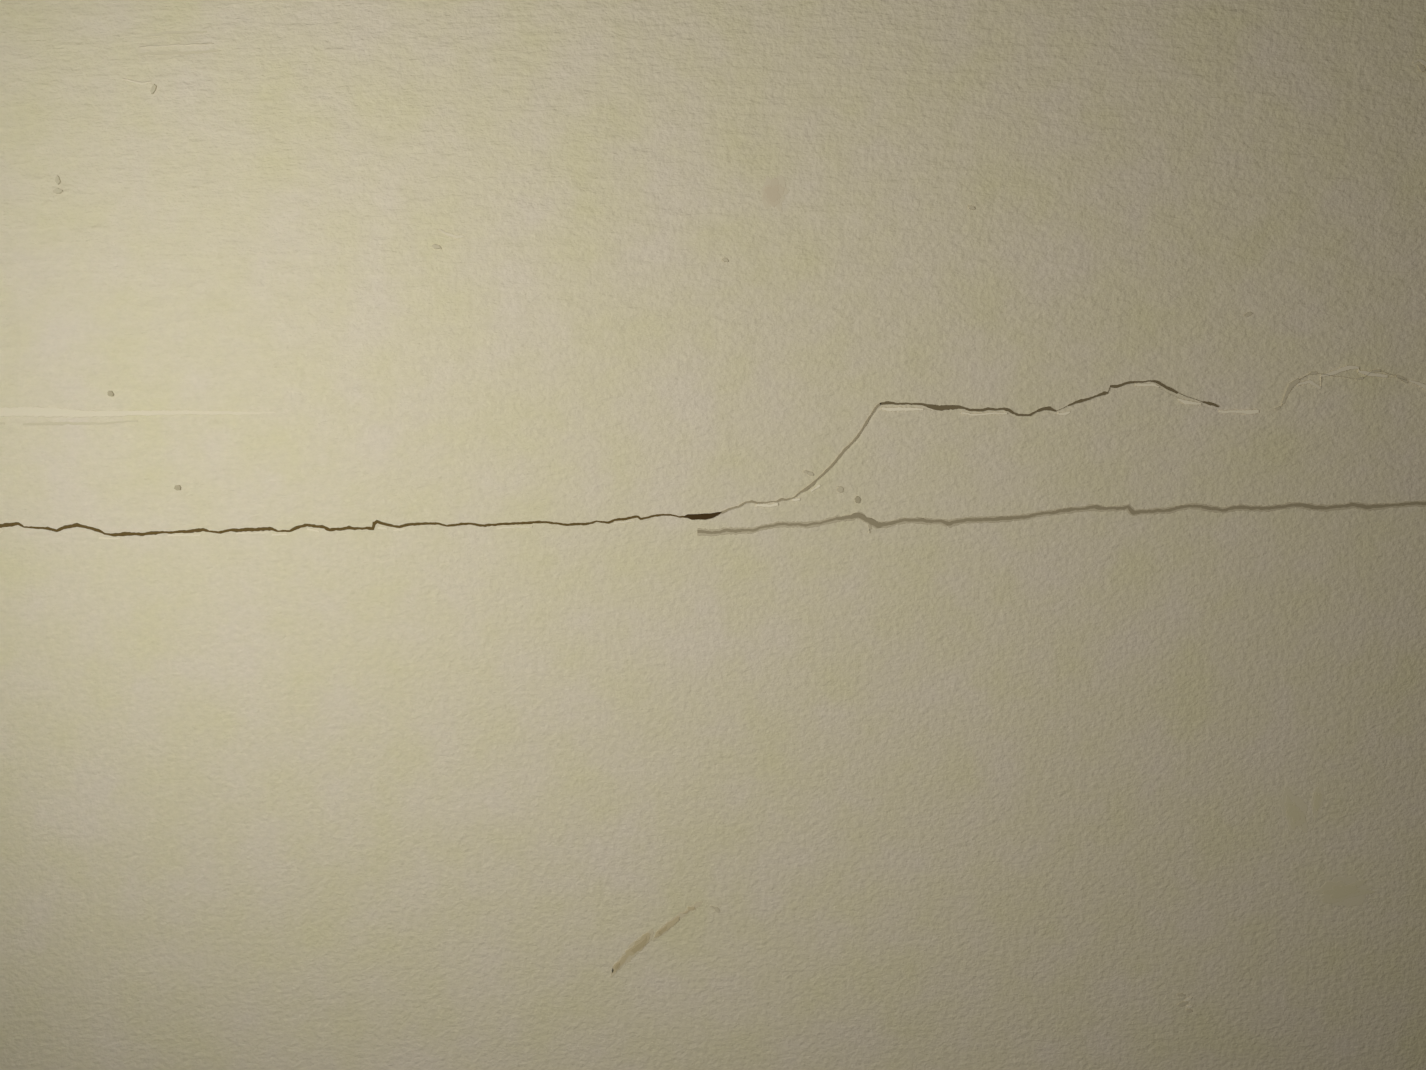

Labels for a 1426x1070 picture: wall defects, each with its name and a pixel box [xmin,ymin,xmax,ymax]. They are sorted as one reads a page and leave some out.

crack [0,380,1426,540]